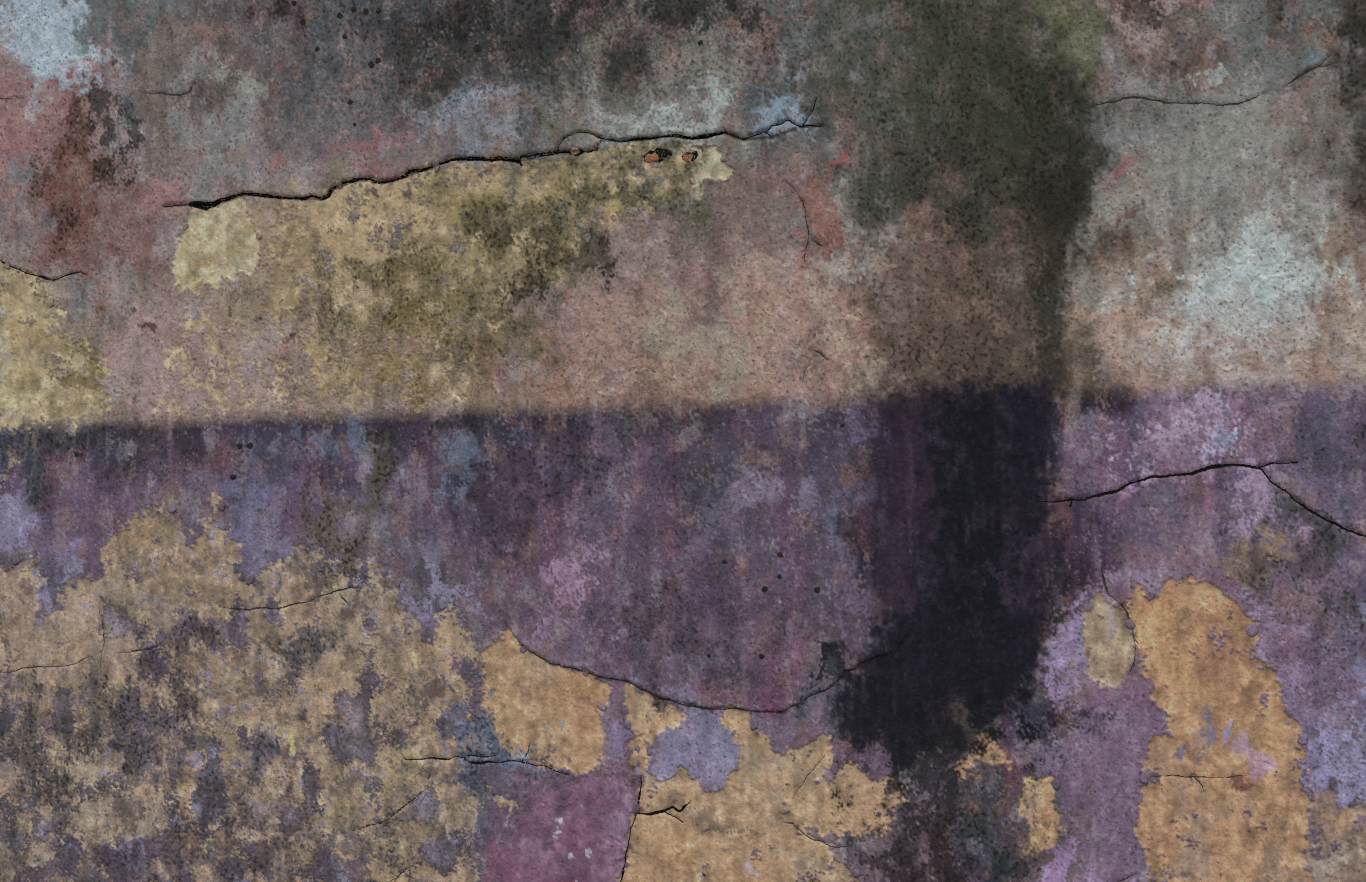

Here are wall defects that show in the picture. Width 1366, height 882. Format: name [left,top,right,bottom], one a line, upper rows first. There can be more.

crack [164,100,821,207]
flaking render [643,139,735,183]
damp [1315,0,1366,250]
peeling [0,256,114,433]
peeling [147,150,507,423]
peeling [0,489,898,882]
crack [620,777,690,882]
crack [505,623,911,713]
damp [228,0,1205,882]
crack [1041,462,1366,537]
peeling [1080,572,1366,882]
damp [1212,385,1366,784]